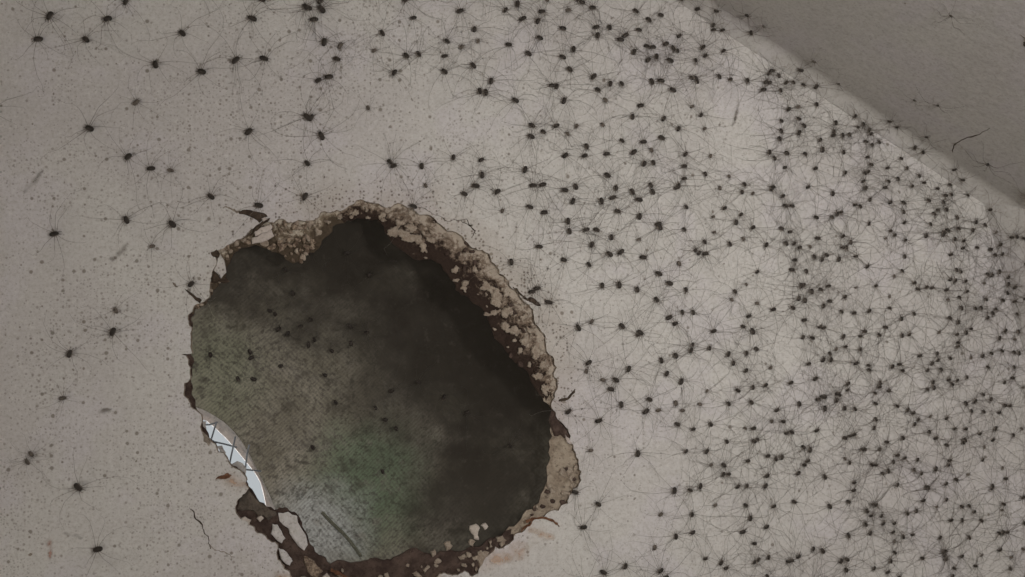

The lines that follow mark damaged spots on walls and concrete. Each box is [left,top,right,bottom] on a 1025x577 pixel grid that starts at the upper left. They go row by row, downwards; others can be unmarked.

crack [190,509,233,557]
spalling [172,200,581,577]